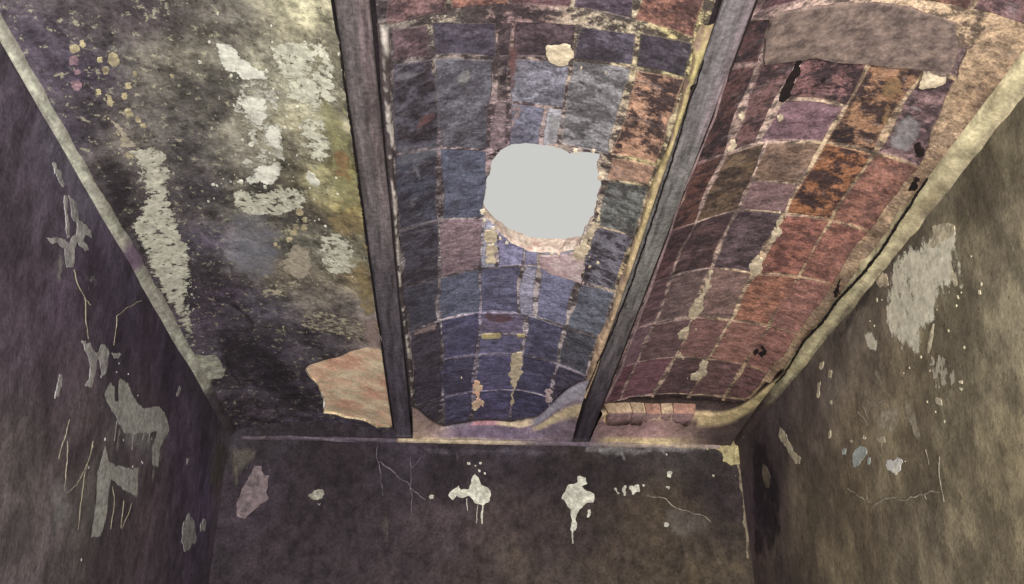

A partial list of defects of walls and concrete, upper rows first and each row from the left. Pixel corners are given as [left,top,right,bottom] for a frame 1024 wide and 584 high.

spalling [779,60,803,102]
peeling [46,162,92,268]
peeling [96,71,225,380]
peeling [207,40,357,298]
spalling [282,311,392,426]
damp [365,320,382,346]
crack [775,177,929,384]
peeling [865,223,972,423]
peeling [81,340,169,537]
peeling [236,461,269,528]
spalling [448,462,491,524]
spalling [562,476,594,543]